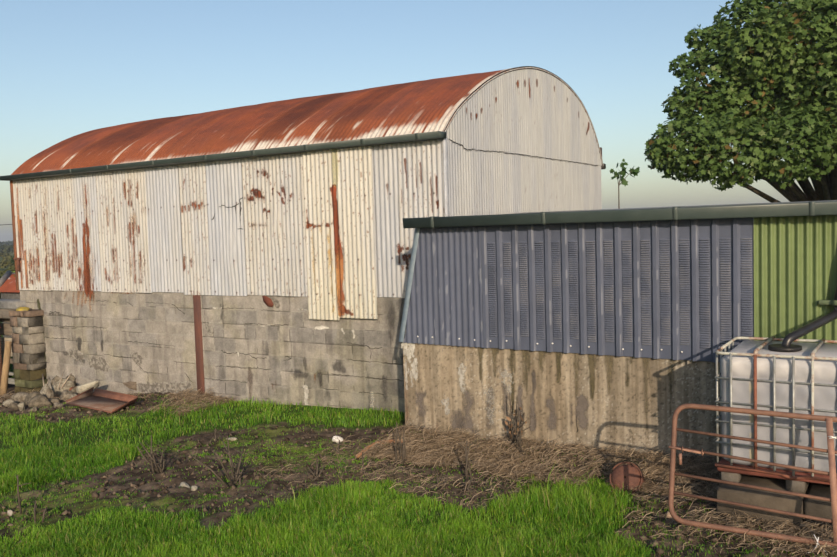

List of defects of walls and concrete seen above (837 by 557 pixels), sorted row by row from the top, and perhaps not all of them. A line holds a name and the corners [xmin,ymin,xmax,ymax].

rust [17,188,94,305]
rust [127,222,145,283]
rust [306,185,353,317]
damp [478,347,498,380]
damp [502,349,543,431]
damp [546,399,556,430]
damp [574,354,595,429]